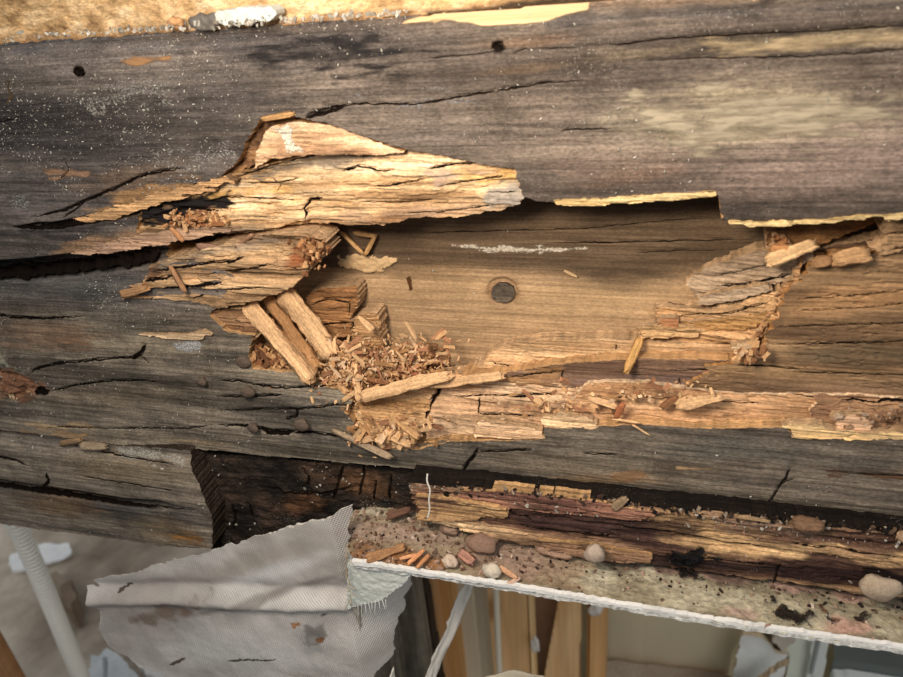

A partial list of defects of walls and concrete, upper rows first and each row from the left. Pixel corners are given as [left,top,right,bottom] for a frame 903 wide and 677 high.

crack [305,80,579,118]
crack [14,167,180,231]
crack [123,155,322,217]
crack [0,247,277,299]
crack [0,313,81,321]
crack [29,345,160,395]
crack [769,469,792,501]
crack [833,469,901,477]
crack [509,502,903,584]
damp [666,547,721,581]
damp [861,567,903,585]
damp [764,595,814,628]